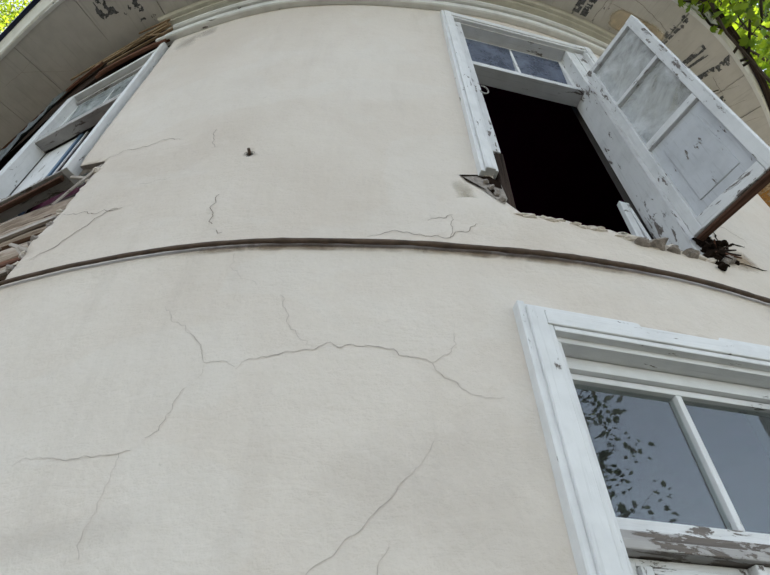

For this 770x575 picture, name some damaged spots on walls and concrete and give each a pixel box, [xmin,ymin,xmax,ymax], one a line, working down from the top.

peeling [572,0,609,21]
leakage [609,10,663,41]
spalling [46,164,103,227]
spalling [459,175,507,204]
spalling [6,235,39,274]
crack [29,207,122,261]
crack [371,215,476,238]
spalling [513,213,742,271]
crack [165,295,505,398]
crack [12,450,130,559]
crack [306,443,433,574]